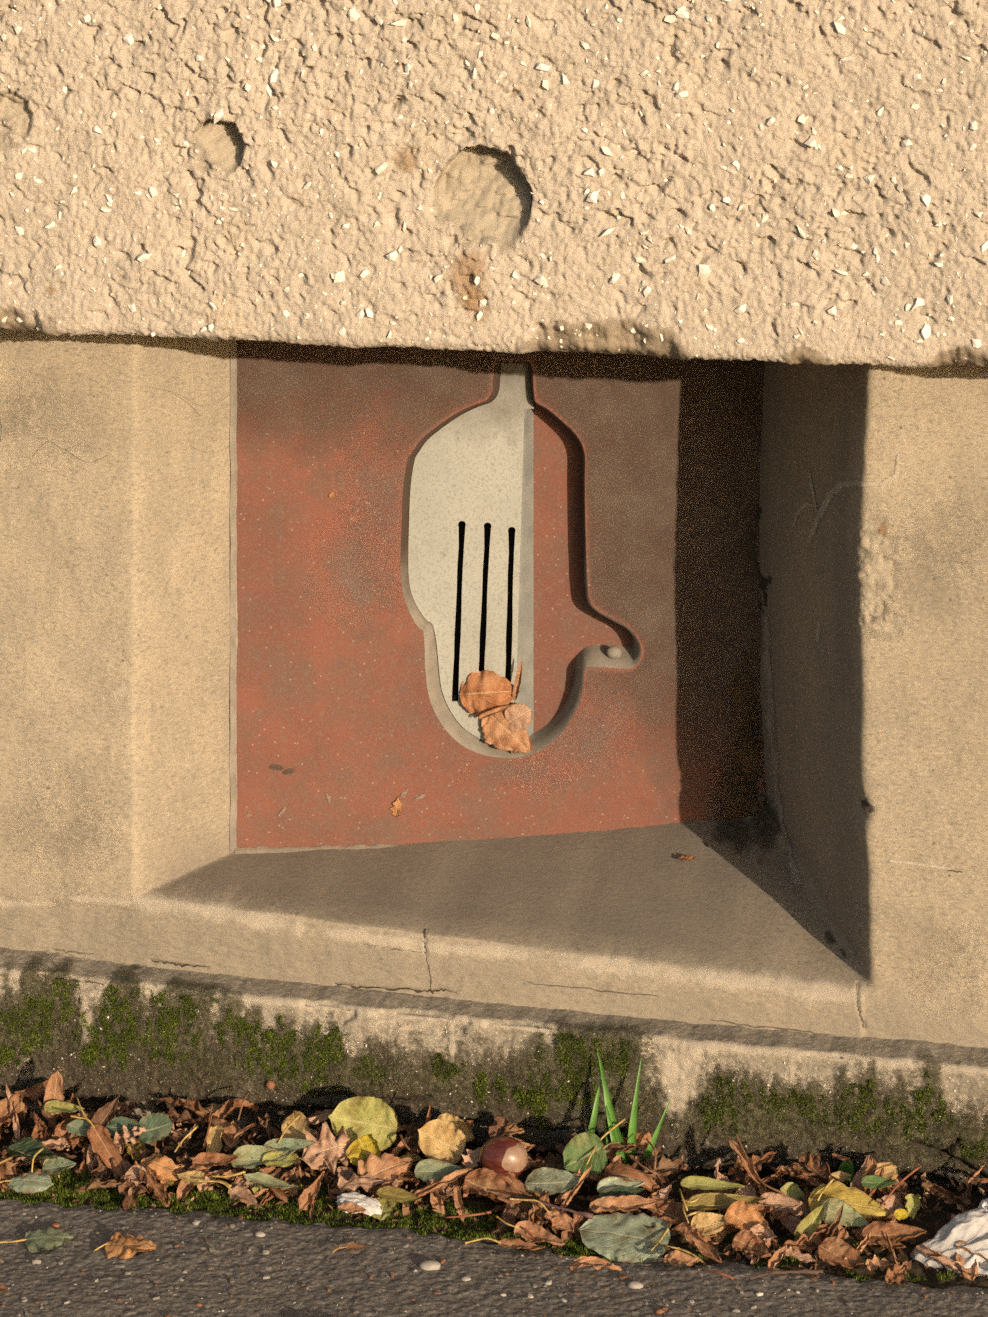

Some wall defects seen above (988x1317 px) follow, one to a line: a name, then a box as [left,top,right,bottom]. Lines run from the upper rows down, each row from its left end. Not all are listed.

spalling [0,0,611,346]
spalling [555,88,697,217]
spalling [664,0,712,24]
spalling [625,40,756,133]
spalling [771,61,822,151]
spalling [837,85,935,156]
spalling [834,0,988,105]
spalling [512,216,719,361]
spalling [668,197,771,315]
spalling [763,162,988,367]
crack [335,929,456,994]
leakage [0,953,988,1193]